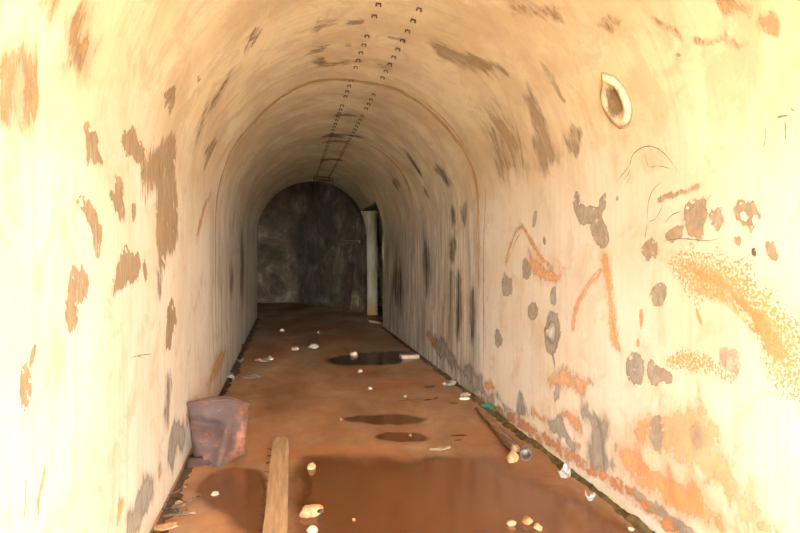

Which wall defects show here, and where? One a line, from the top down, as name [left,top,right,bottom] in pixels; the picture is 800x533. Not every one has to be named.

peeling [84,121,103,168]
peeling [64,265,89,334]
peeling [112,245,147,296]
peeling [109,125,179,272]
rust [506,227,560,282]
rust [572,254,620,351]
crack [616,146,722,242]
peeling [642,198,724,261]
rust [666,245,800,397]
peeling [734,199,761,233]
rust [479,382,722,530]
rust [635,408,768,533]